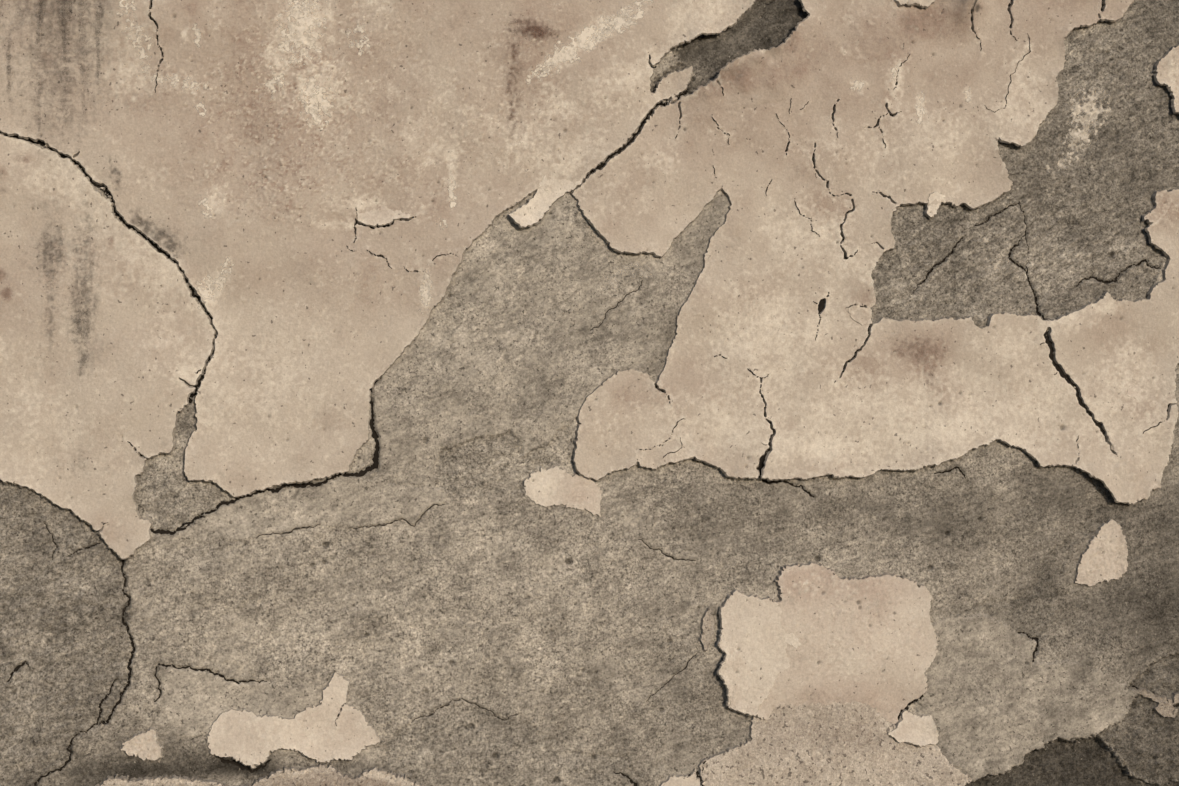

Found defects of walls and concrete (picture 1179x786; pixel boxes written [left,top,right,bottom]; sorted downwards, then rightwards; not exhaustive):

crack [0,132,217,403]
crack [149,0,163,93]
peeling [0,0,755,786]
crack [714,354,814,498]
peeling [433,0,1179,517]
crack [766,98,893,259]
crack [813,292,870,383]
crack [869,54,910,148]
crack [913,201,1118,457]
crack [1077,259,1161,286]
spalling [973,510,1130,641]
peeling [660,561,1179,786]